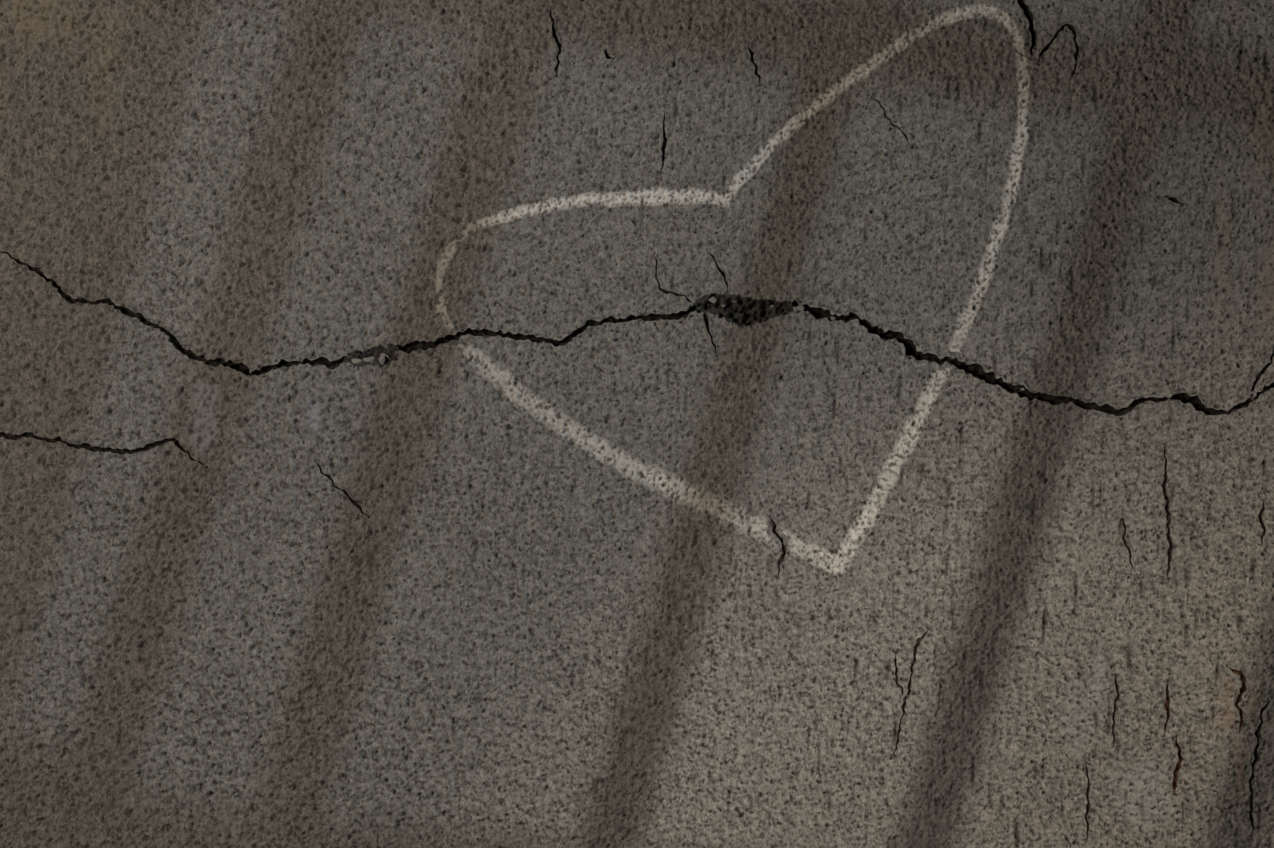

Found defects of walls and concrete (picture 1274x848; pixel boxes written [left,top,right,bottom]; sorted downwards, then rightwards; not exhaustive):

crack [1017,0,1080,72]
crack [0,251,1274,416]
crack [0,432,206,467]